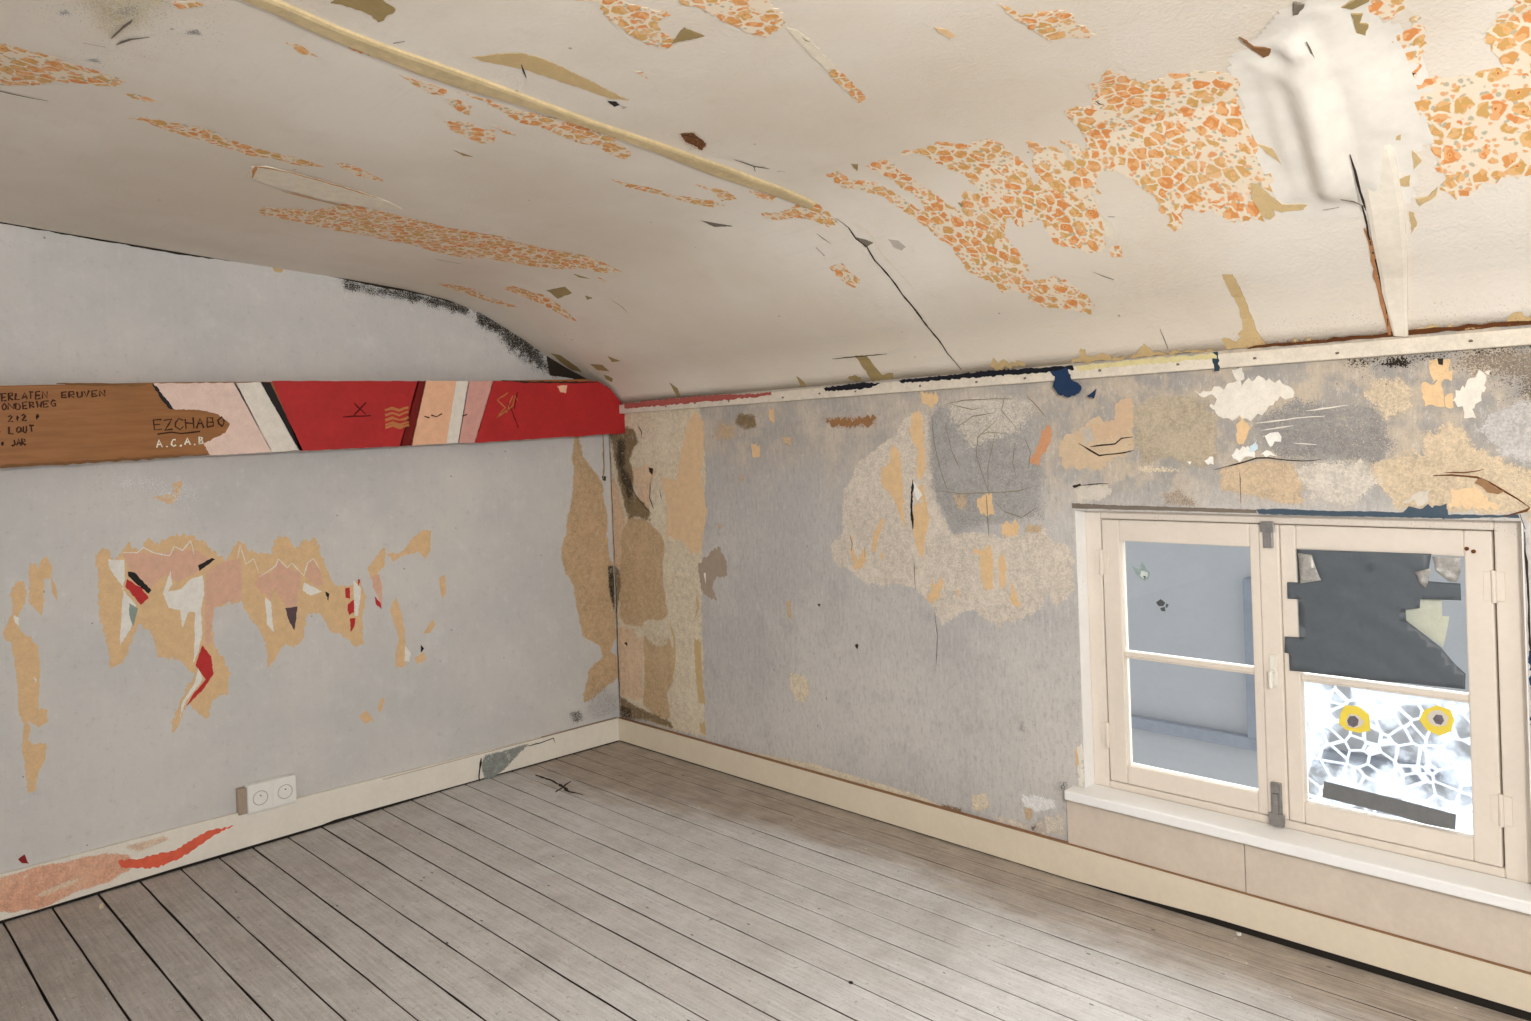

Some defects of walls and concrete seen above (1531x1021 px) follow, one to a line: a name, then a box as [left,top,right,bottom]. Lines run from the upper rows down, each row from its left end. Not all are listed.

peeling [828,69,865,103]
peeling [1239,37,1271,58]
peeling [1250,183,1307,220]
peeling [1293,2,1305,16]
peeling [1341,0,1426,79]
peeling [1396,134,1437,233]
peeling [3,557,57,793]
peeling [94,530,435,733]
peeling [561,383,727,738]
crack [837,219,1051,538]
peeling [830,274,1265,629]
spalling [1072,358,1531,699]